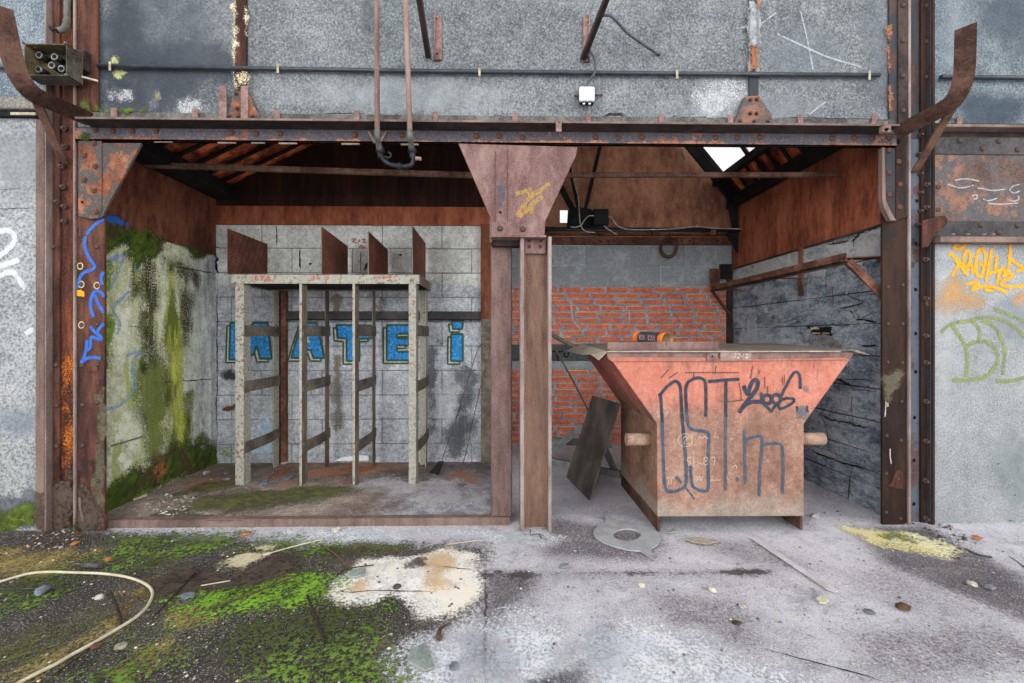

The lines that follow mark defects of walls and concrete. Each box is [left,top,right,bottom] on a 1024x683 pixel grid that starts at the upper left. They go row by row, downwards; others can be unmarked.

corrosion [751,46,761,71]
crack [827,228,876,246]
leakage [124,249,202,369]
crack [832,288,879,347]
corrosion [61,356,73,464]